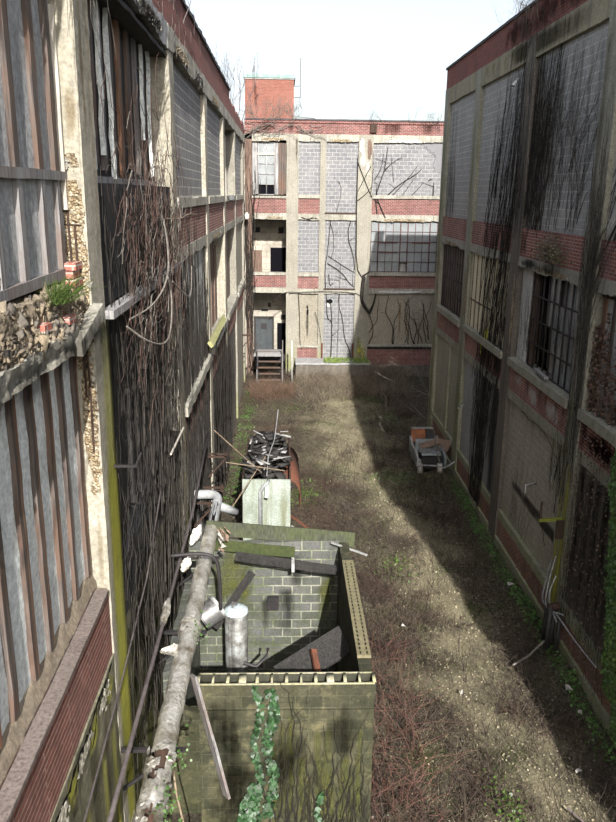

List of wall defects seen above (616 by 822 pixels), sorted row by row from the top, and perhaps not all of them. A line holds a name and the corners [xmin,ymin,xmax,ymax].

water stain [107,421,189,822]
water stain [226,764,248,811]
water stain [271,747,300,783]